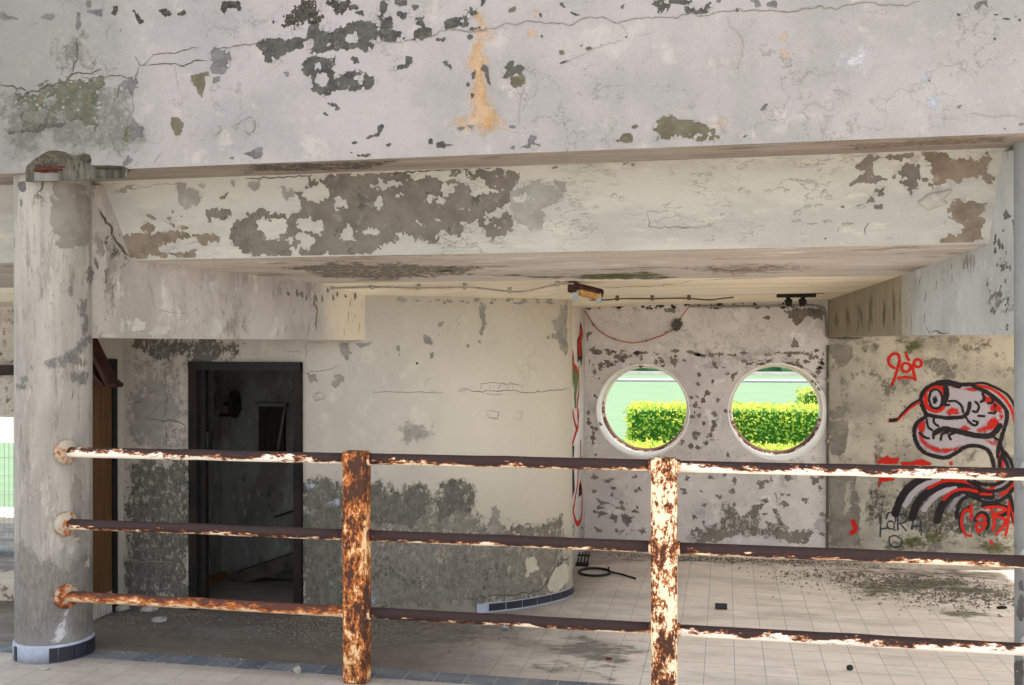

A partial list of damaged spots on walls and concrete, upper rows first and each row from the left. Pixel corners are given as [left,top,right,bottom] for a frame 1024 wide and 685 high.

crack [1,33,256,191]
peeling [256,0,485,116]
corrosion [458,15,500,131]
crack [100,211,130,270]
peeling [123,166,581,260]
peeling [792,151,1014,331]
peeling [586,307,853,456]
leakage [123,339,245,597]
leakage [303,476,343,606]
leakage [371,478,569,609]
peeling [591,473,646,536]
peeling [680,474,861,548]